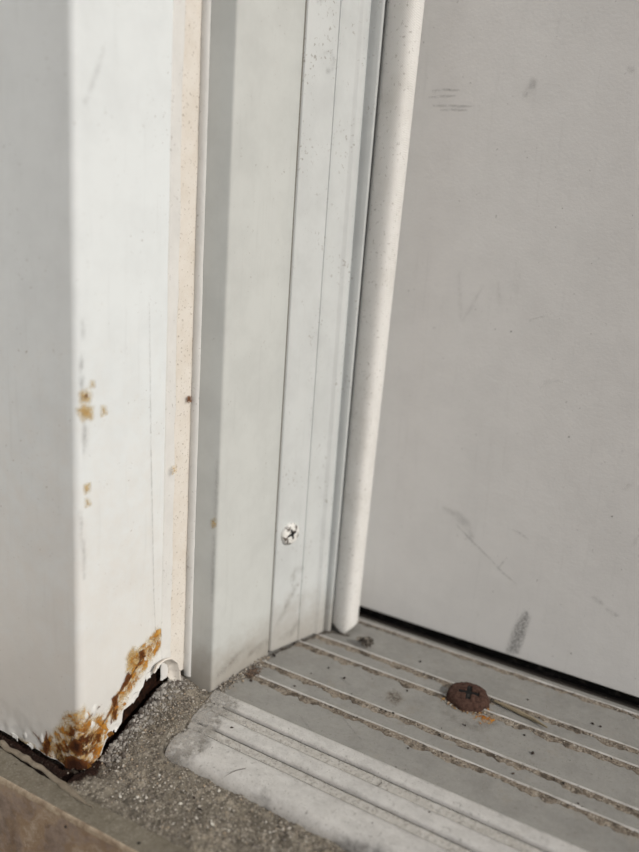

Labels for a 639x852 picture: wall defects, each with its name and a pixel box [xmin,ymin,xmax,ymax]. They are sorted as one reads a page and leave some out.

rust [78,384,93,418]
rust [0,629,162,783]